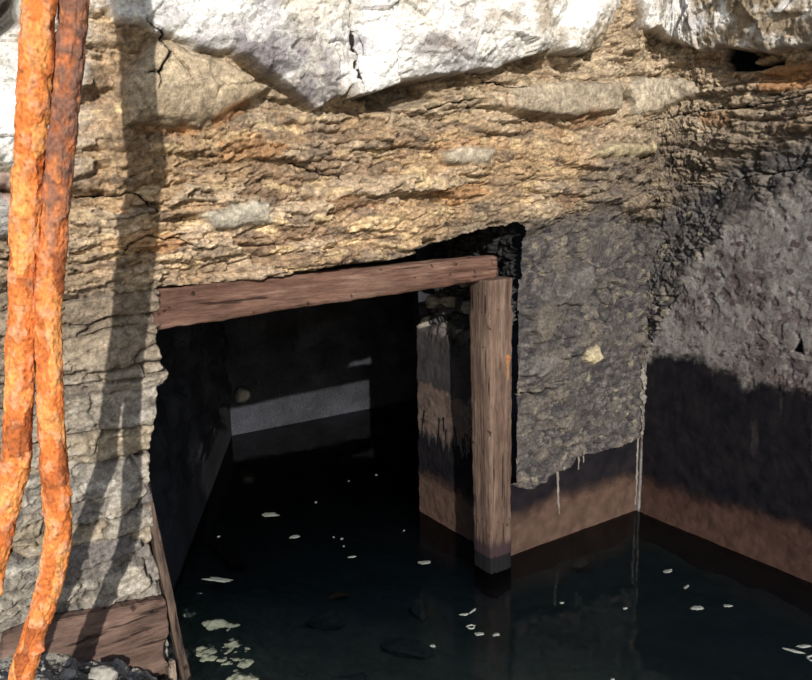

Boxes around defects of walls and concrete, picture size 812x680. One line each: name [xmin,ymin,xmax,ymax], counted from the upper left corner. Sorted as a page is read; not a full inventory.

crack [146,19,189,86]
crack [343,14,365,102]
rust [0,173,11,205]
crack [74,192,162,212]
water stain [418,433,474,503]
water stain [510,349,812,533]